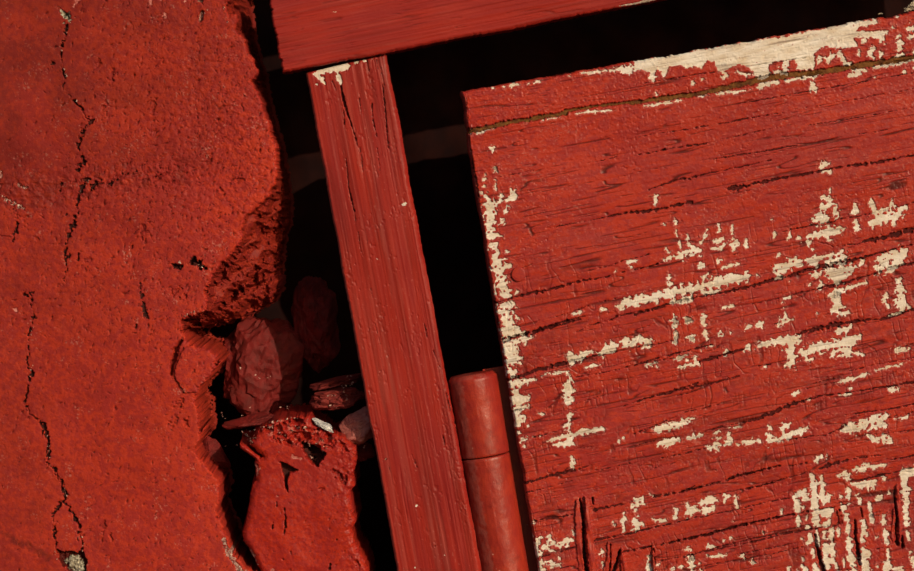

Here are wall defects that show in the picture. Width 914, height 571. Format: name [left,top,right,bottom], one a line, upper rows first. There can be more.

peeling [313,59,367,86]
peeling [568,16,914,107]
crack [50,24,138,279]
peeling [479,166,655,470]
peeling [600,220,760,370]
peeling [743,188,912,368]
crack [23,291,84,551]
peeling [653,417,809,453]
peeling [840,412,909,445]
peeling [532,521,575,571]
peeling [612,493,739,533]
peeling [780,462,914,571]